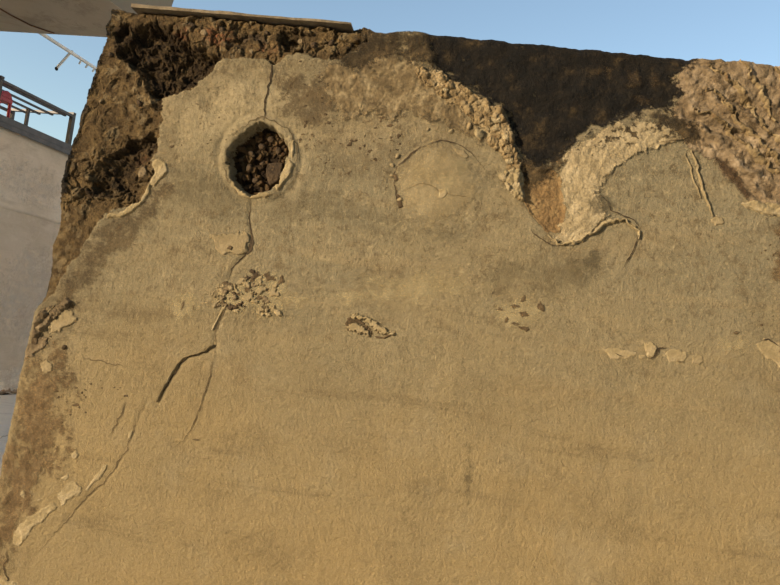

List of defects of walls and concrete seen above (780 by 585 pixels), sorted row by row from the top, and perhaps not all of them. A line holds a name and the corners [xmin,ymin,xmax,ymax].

crack [223,165,254,279]
spalling [24,9,780,374]
crack [598,193,639,270]
crack [37,306,226,554]